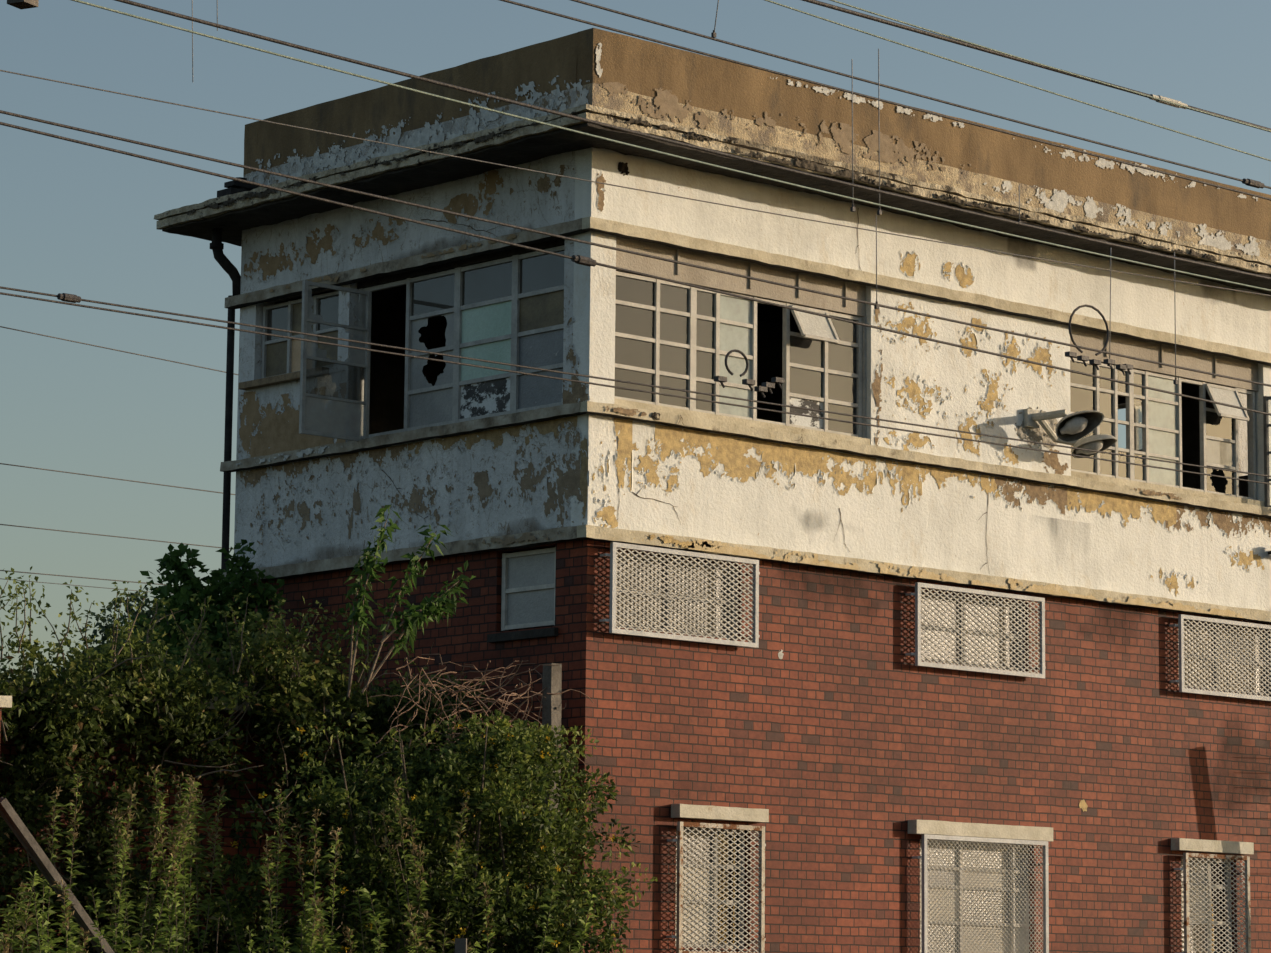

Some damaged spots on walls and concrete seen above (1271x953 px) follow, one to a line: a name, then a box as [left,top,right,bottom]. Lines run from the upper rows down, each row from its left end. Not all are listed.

spalling [172,149,318,218]
flaking render [243,216,409,292]
spalling [368,91,540,167]
flaking render [442,163,577,225]
peeling [586,77,913,192]
peeling [748,111,1042,204]
peeling [868,100,965,128]
peeling [1035,144,1119,169]
spalling [1076,196,1220,261]
peeling [236,301,1271,573]
crack [617,483,681,527]
peeling [634,534,1244,618]